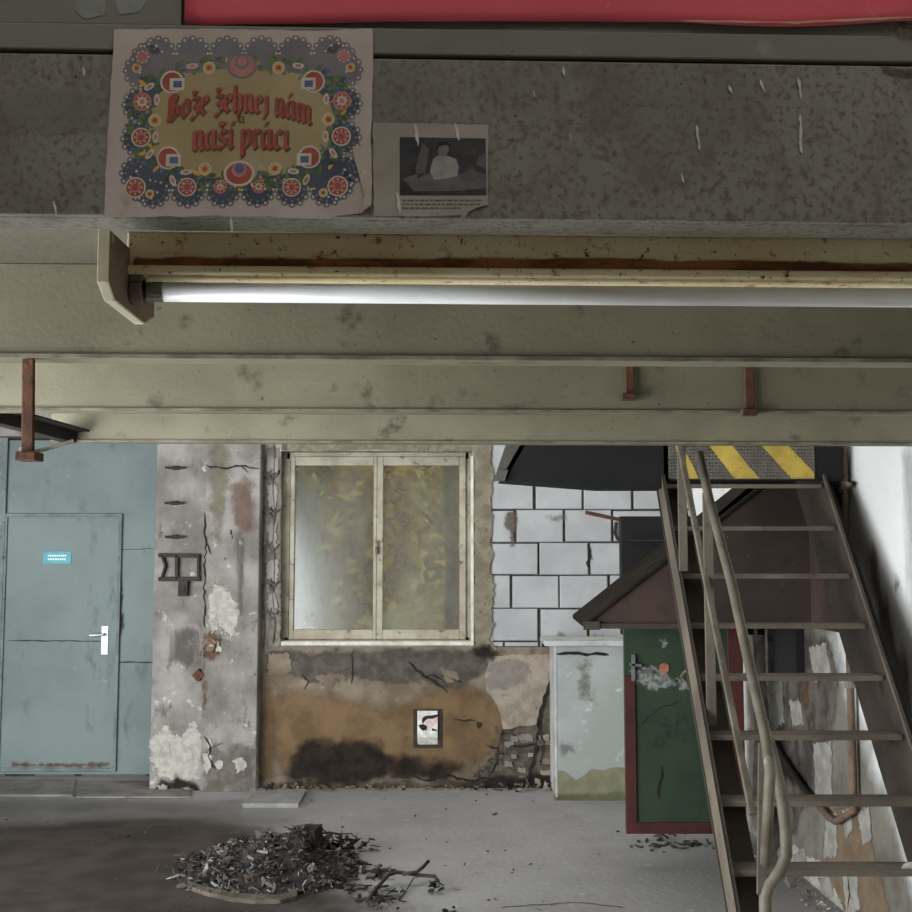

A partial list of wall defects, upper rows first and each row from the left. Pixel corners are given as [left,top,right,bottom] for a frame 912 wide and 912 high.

damp [211,445,253,530]
crack [206,463,259,473]
crack [203,513,211,627]
peeling [207,582,240,641]
flaking render [264,447,551,788]
crack [408,661,448,692]
peeling [149,723,255,791]
crack [204,737,222,768]
damp [261,686,504,788]